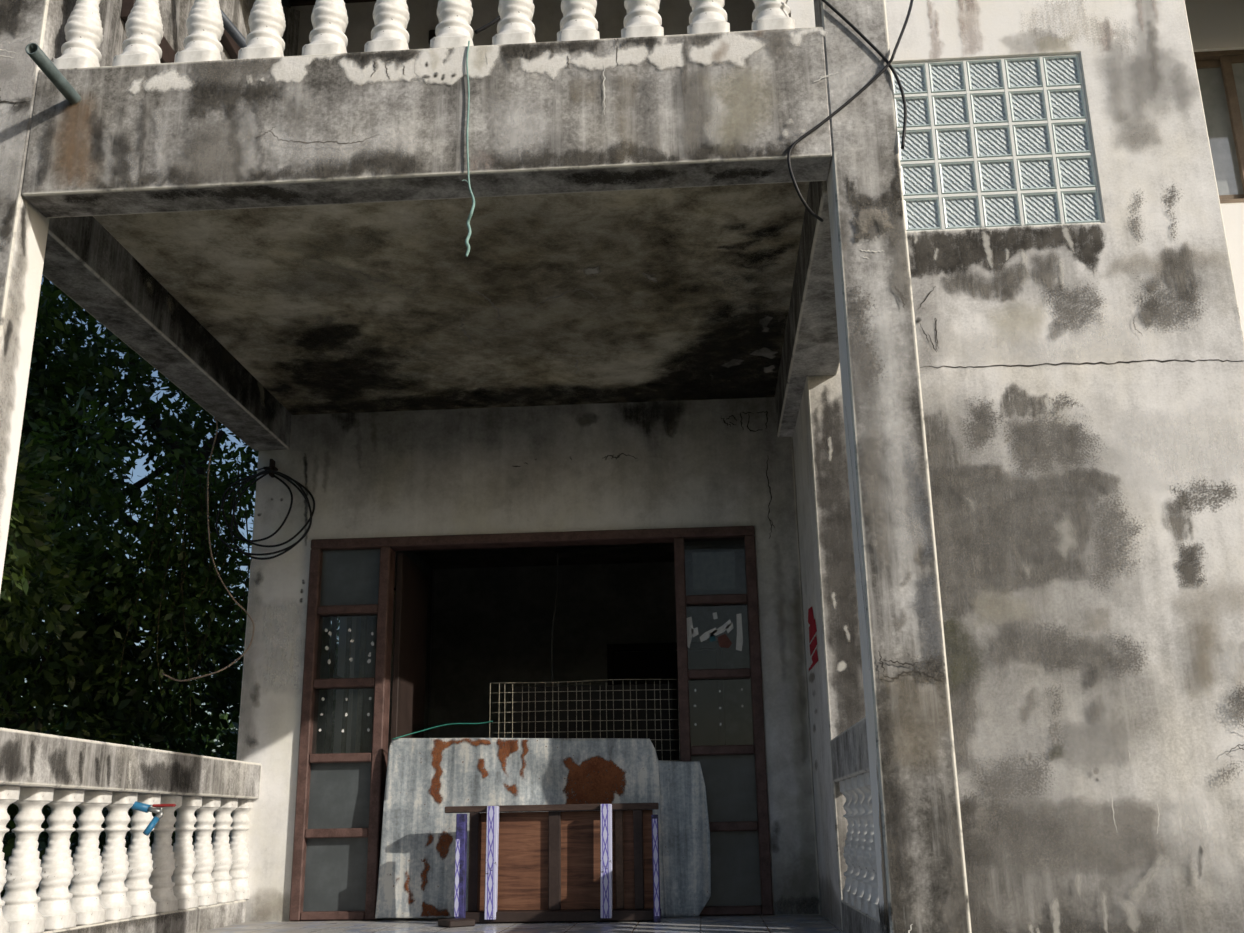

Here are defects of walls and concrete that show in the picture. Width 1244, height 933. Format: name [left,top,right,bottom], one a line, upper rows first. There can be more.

peeling [129,69,196,94]
water stain [66,58,418,205]
peeling [246,45,500,85]
water stain [344,49,418,67]
water stain [839,161,1104,339]
water stain [133,224,788,436]
crack [920,317,1243,368]
water stain [904,386,1148,687]
water stain [1168,477,1237,587]
water stain [815,389,907,933]
water stain [129,761,193,793]
water stain [943,686,1164,933]